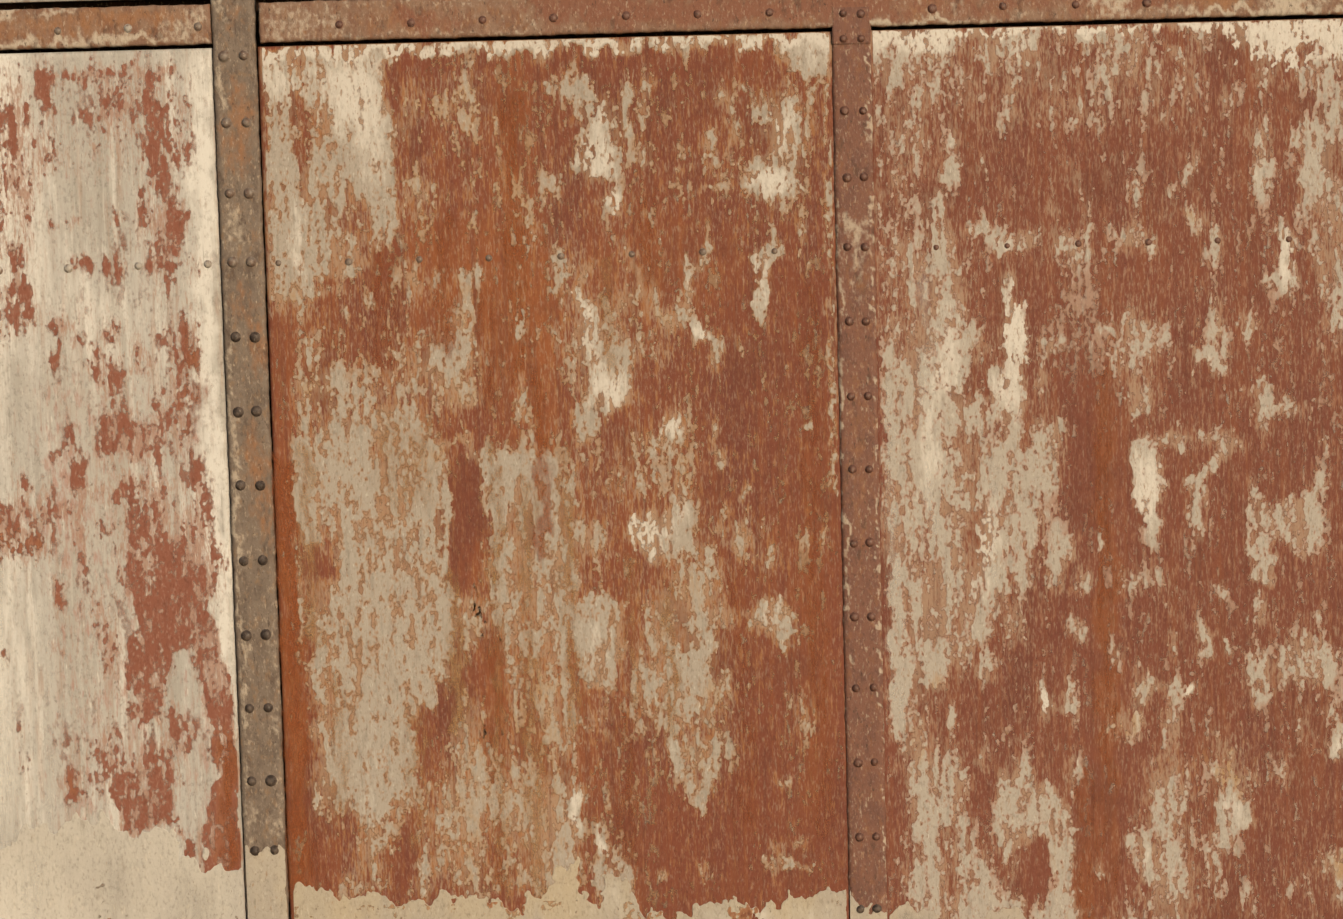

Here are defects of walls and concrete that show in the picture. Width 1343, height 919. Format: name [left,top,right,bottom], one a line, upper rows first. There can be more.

corrosion [276,459,311,884]
corrosion [529,413,551,558]
peeling [872,19,1343,919]
corrosion [727,904,763,919]